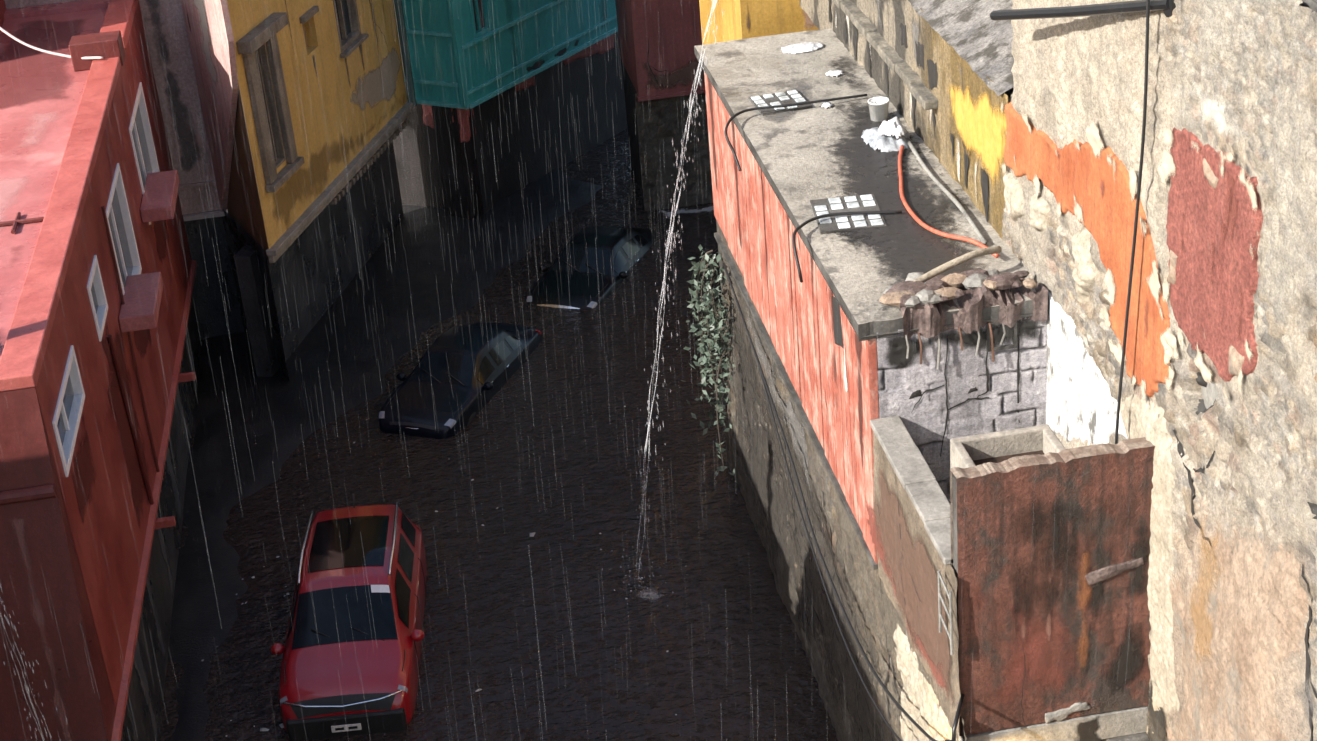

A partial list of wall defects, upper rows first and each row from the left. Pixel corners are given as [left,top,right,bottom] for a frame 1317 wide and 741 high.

flaking render [900,23,1263,415]
crack [911,321,1020,457]
spalling [879,246,1128,445]
corrosion [1079,629,1088,666]
corrosion [1079,553,1090,609]
crack [1301,564,1317,741]